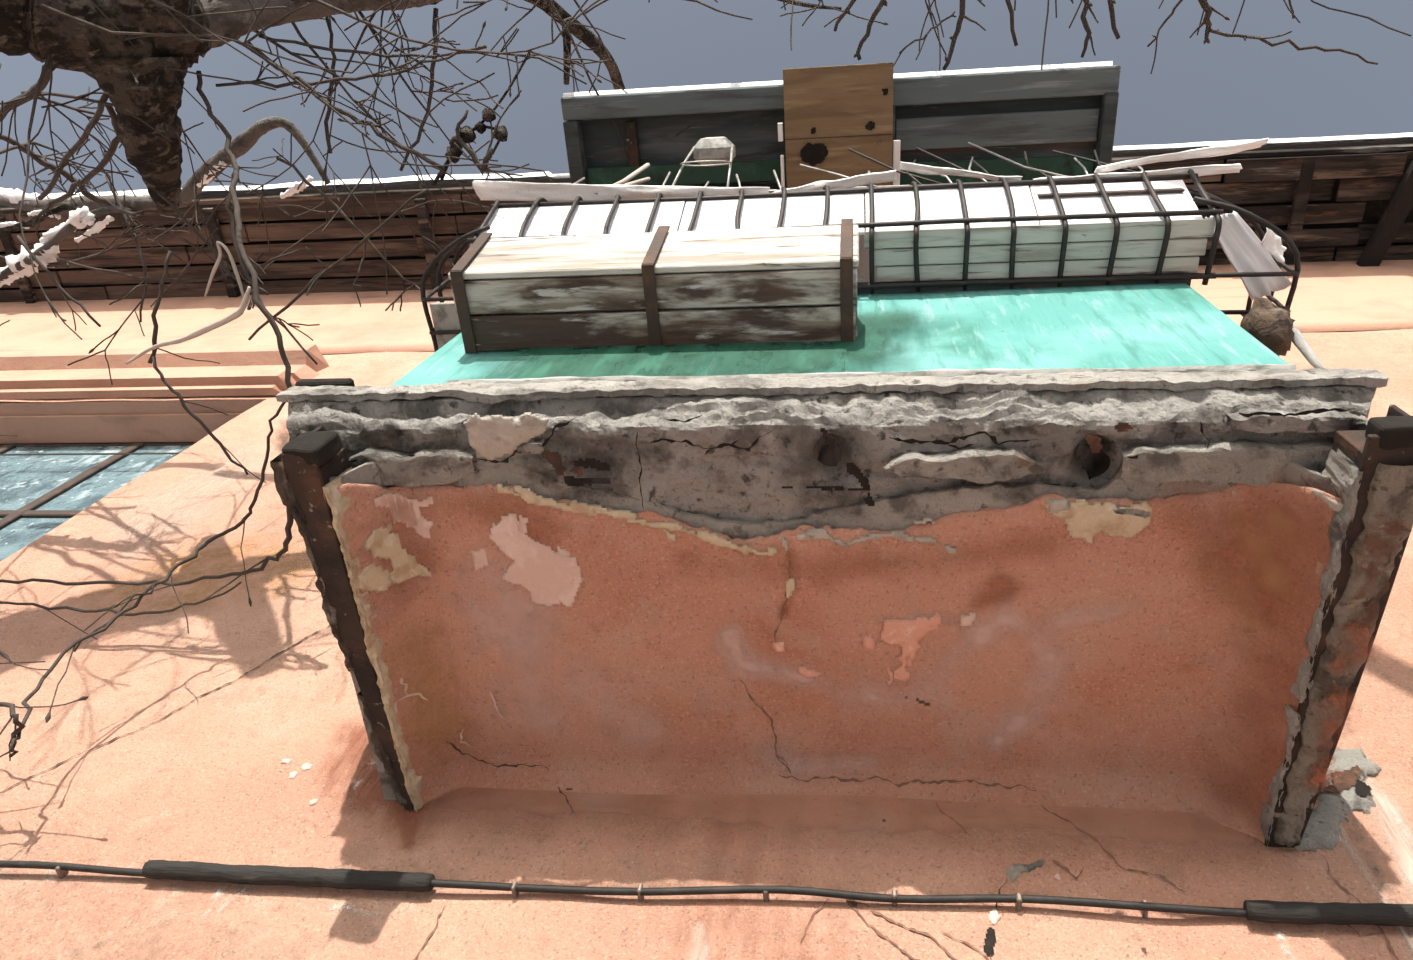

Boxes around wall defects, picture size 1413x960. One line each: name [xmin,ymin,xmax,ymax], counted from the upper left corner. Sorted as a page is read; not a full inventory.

crack [635,415,775,509]
crack [889,431,1037,450]
spalling [1081,436,1110,480]
spalling [1115,422,1133,432]
crack [1239,408,1351,418]
peeling [358,492,434,594]
peeling [463,412,956,607]
peeling [1045,499,1153,543]
crack [0,625,330,793]
rust [330,728,426,846]
crack [739,679,1191,960]
damp [1372,791,1413,885]